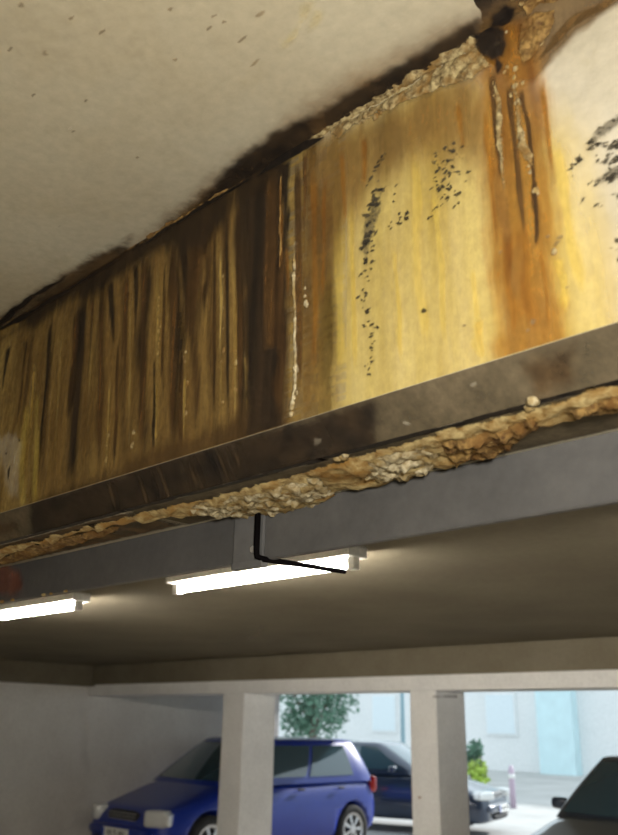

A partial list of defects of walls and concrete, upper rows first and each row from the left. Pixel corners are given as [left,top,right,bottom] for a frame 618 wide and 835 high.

water stain [0,0,618,513]
hole [474,0,516,74]
rust [480,21,565,358]